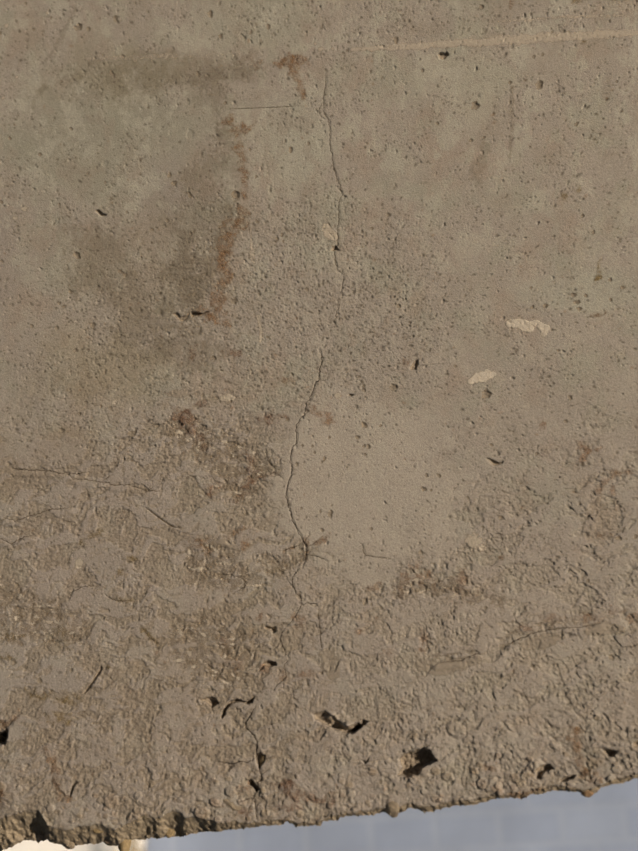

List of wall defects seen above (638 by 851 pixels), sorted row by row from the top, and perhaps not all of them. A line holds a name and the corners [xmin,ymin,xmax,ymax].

crack [264,350,326,686]
spalling [0,774,638,851]